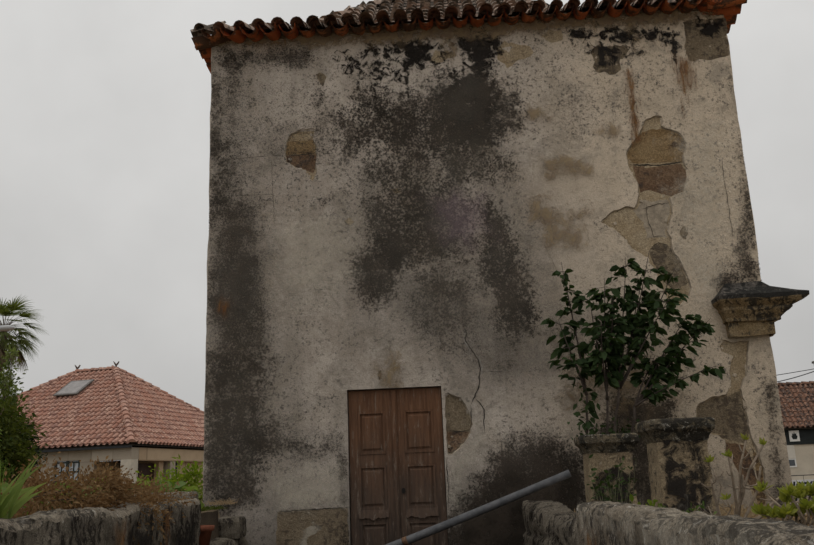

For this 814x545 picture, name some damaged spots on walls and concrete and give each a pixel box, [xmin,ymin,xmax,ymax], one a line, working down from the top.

flaking render [683,15,730,62]
flaking render [277,122,325,188]
water stain [203,10,712,516]
flaking render [593,108,700,313]
flaking render [441,384,481,463]
crack [463,317,502,432]
flaking render [687,332,777,509]